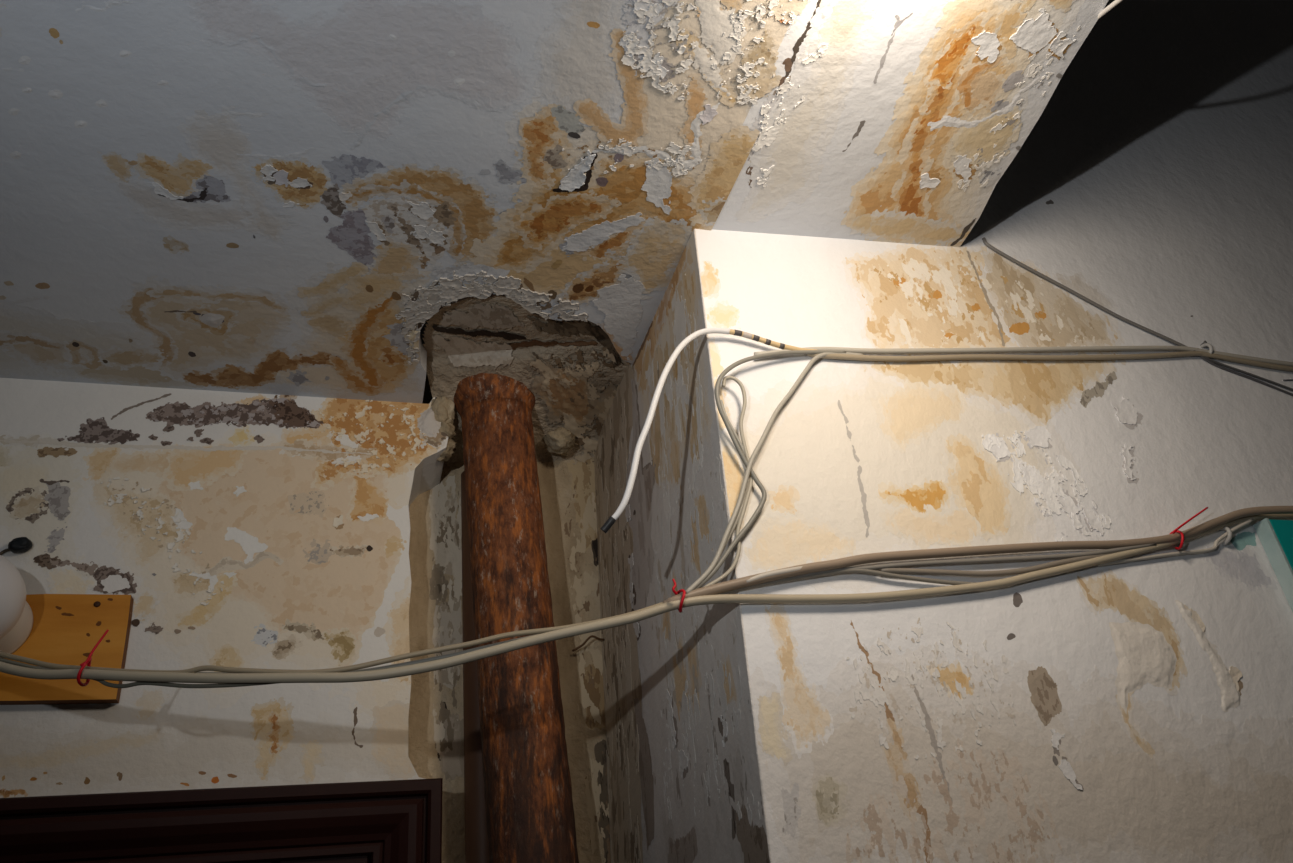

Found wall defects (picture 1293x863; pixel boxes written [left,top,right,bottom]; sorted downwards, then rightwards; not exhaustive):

spalling [618,0,697,100]
water stain [97,105,299,255]
peeling [543,105,705,257]
peeling [37,370,428,475]
peeling [6,482,137,595]
water stain [0,237,448,798]
spalling [260,154,729,863]
water stain [1076,568,1188,696]
water stain [1203,545,1278,596]
water stain [594,739,610,863]
peeling [718,716,770,863]
water stain [633,591,1293,863]